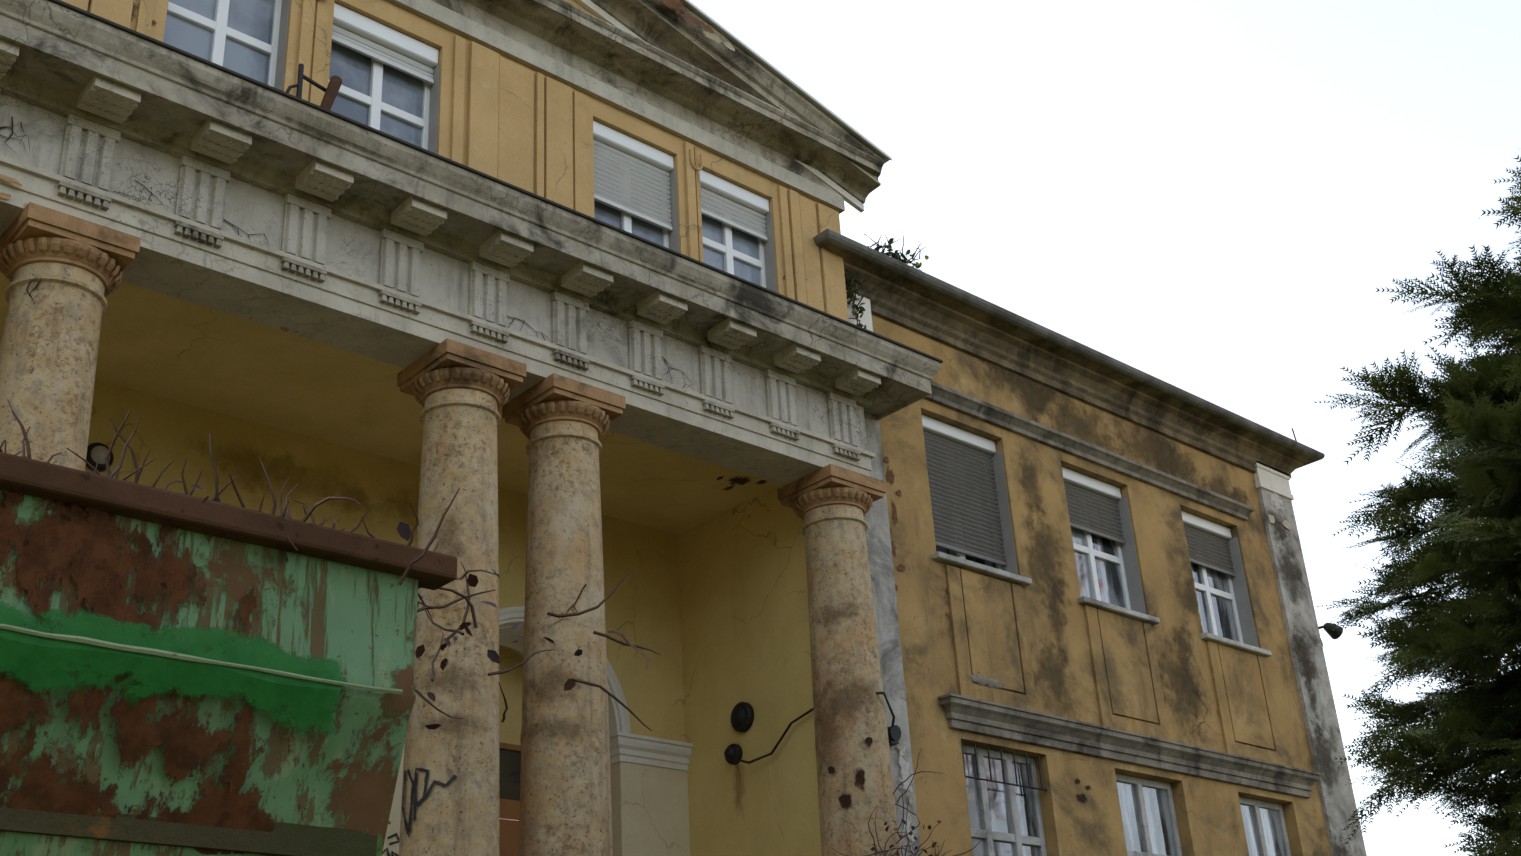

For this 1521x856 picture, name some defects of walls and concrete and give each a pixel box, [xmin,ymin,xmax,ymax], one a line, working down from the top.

flaking render [656,0,735,51]